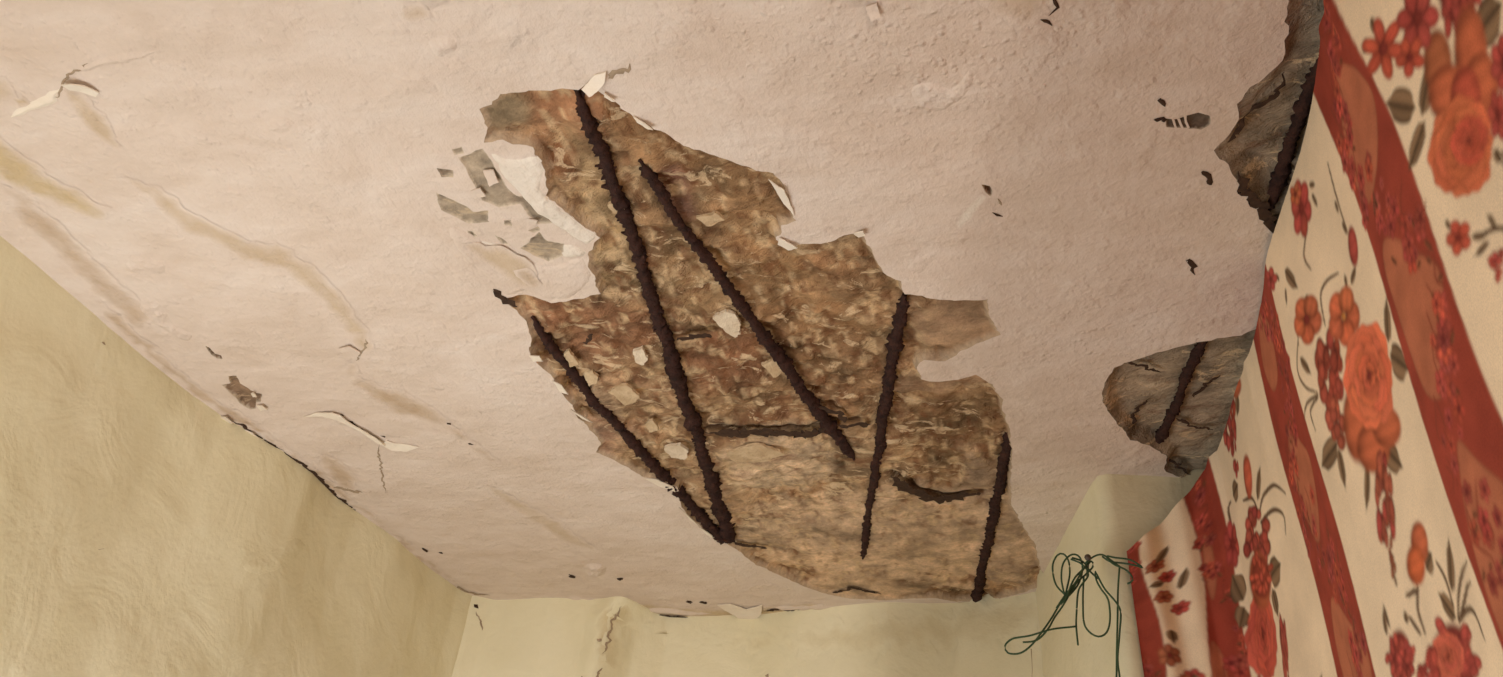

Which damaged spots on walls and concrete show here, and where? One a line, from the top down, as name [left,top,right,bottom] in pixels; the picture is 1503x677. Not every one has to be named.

crack [979,0,1060,37]
crack [11,50,160,117]
spalling [1166,113,1211,130]
spalling [1214,0,1324,233]
spalling [436,64,1043,603]
spalling [1102,329,1256,477]
peeling [687,601,762,619]